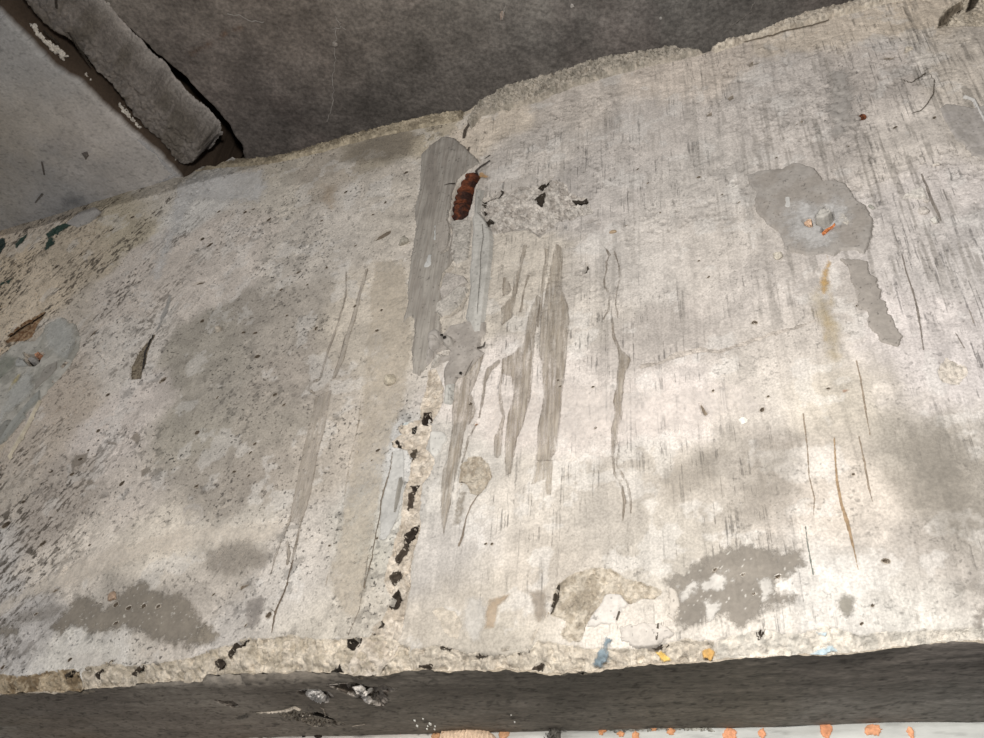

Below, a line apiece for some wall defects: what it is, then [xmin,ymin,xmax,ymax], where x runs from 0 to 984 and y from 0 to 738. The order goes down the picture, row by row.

spalling [938,0,984,28]
spalling [195,0,904,172]
peeling [436,220,472,317]
corrosion [445,155,491,221]
spalling [482,180,594,238]
corrosion [804,219,836,236]
damp [50,581,219,647]
spalling [389,525,420,609]
spalling [0,567,984,707]
damp [665,544,804,630]